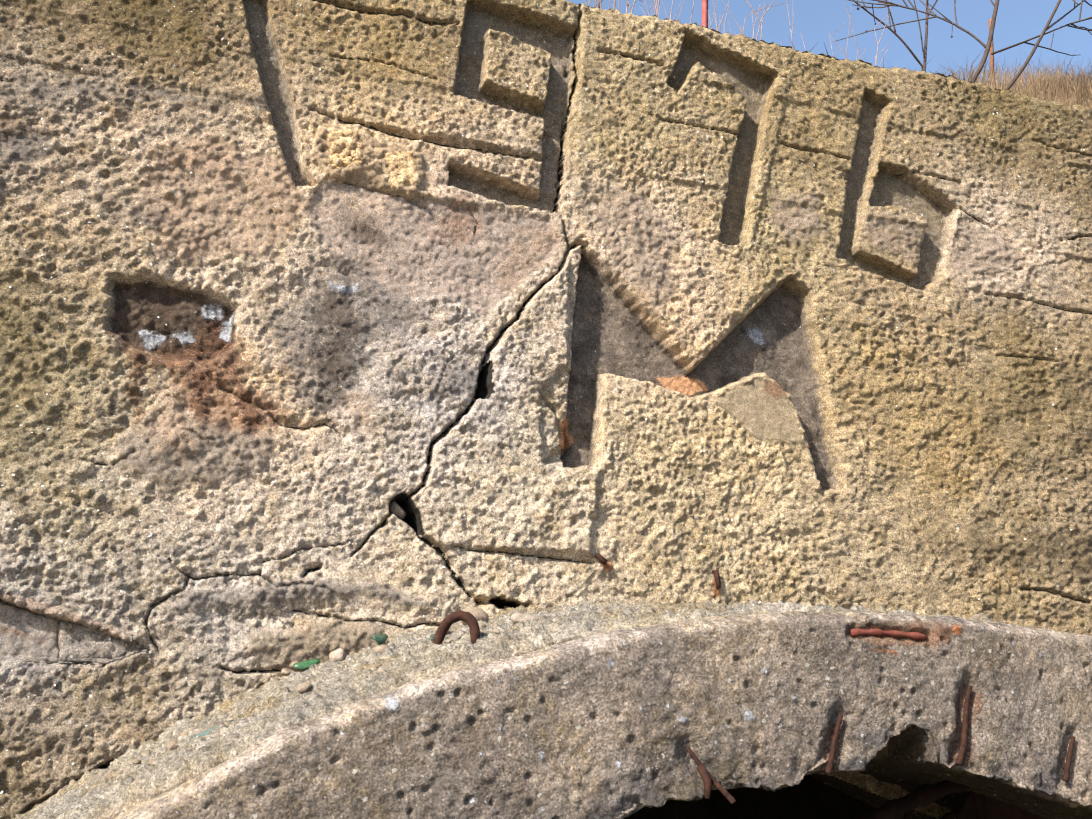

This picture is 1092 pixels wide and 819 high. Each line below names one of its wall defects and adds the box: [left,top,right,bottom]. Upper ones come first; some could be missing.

crack [553,31,577,212]
corrosion [105,319,283,437]
crack [142,245,584,648]
crack [27,659,96,667]
crack [221,666,280,674]
corrosion [852,622,960,653]
corrosion [950,687,982,764]
spalling [1062,736,1076,782]